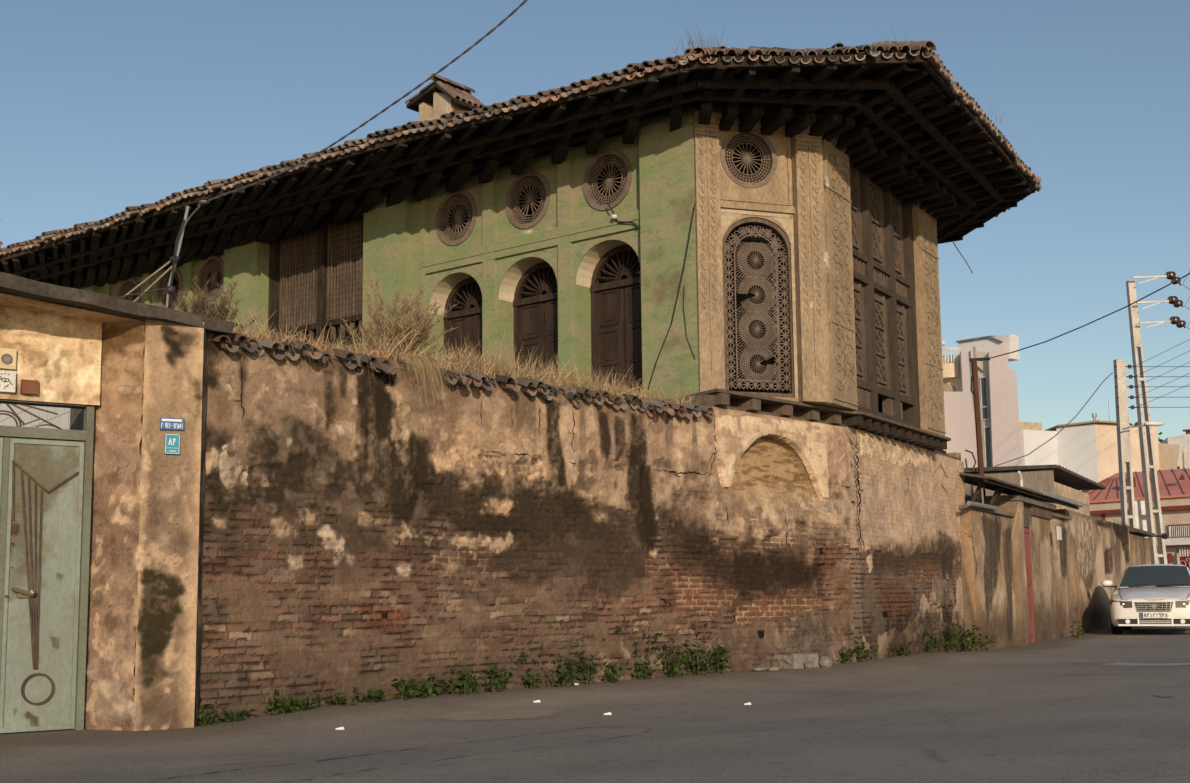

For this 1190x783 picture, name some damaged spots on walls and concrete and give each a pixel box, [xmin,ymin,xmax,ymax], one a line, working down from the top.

peeling [271,508,353,565]
peeling [396,565,411,576]
leakage [200,364,657,598]
peeling [394,525,514,554]
peeling [432,425,551,485]
peeling [484,499,512,514]
spalling [667,547,844,656]
crack [851,428,865,550]
leakage [872,532,961,580]
leakage [982,512,1013,639]
leakage [1060,520,1130,588]
leakage [887,610,965,658]